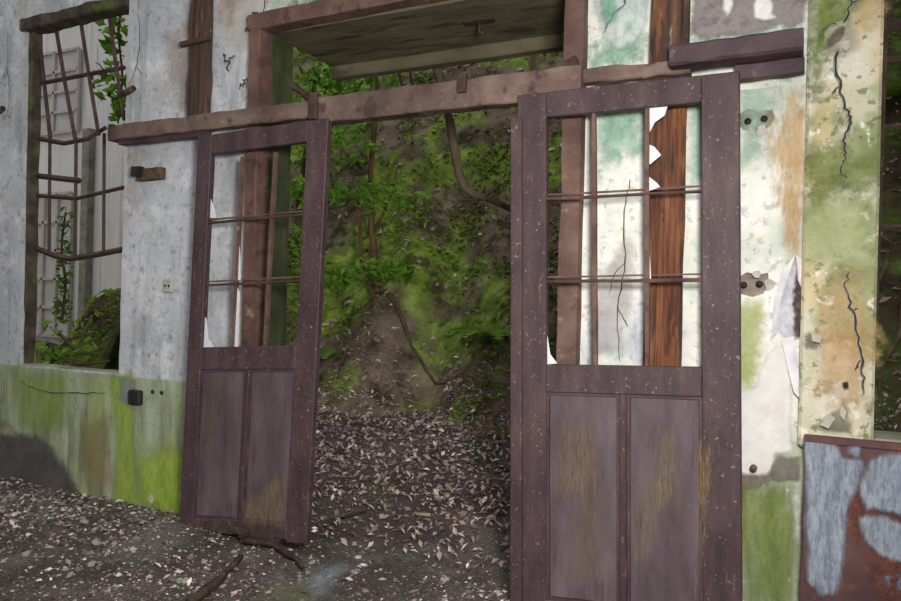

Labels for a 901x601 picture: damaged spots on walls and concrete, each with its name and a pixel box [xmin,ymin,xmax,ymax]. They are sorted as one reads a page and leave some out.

peeling [691,0,806,39]
crack [823,0,861,31]
crack [223,53,248,90]
crack [831,50,853,178]
rust [774,94,804,240]
flaking render [741,254,821,397]
crack [843,272,866,395]
leakage [0,424,77,493]
rust [847,473,873,543]
rust [870,553,901,601]